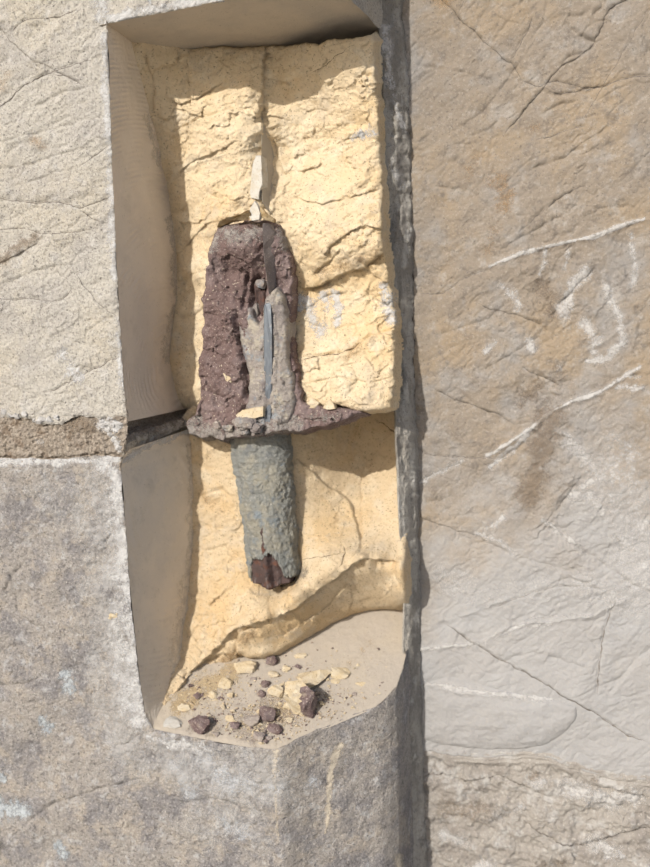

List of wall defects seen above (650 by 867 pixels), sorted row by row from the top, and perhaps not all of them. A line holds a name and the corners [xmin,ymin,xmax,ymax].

crack [0,11,89,107]
crack [442,0,650,140]
crack [0,197,109,263]
peeling [217,201,276,228]
crack [412,271,512,423]
spalling [236,406,265,418]
spalling [307,397,337,410]
rust [251,528,296,590]
crack [449,585,645,741]